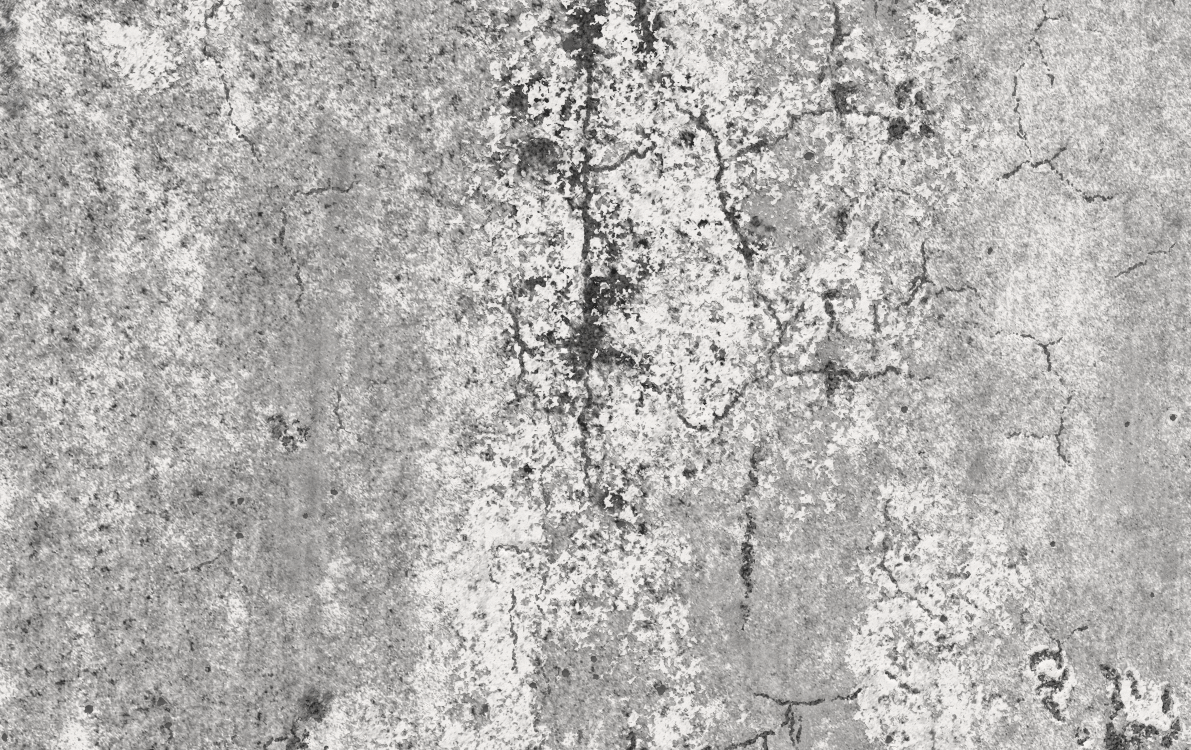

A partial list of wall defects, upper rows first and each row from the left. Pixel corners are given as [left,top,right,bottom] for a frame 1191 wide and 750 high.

crack [993,3,1113,203]
crack [676,0,1073,467]
crack [487,0,653,750]
crack [885,671,910,692]
crack [148,727,173,750]
crack [263,730,329,750]
crack [702,688,861,750]